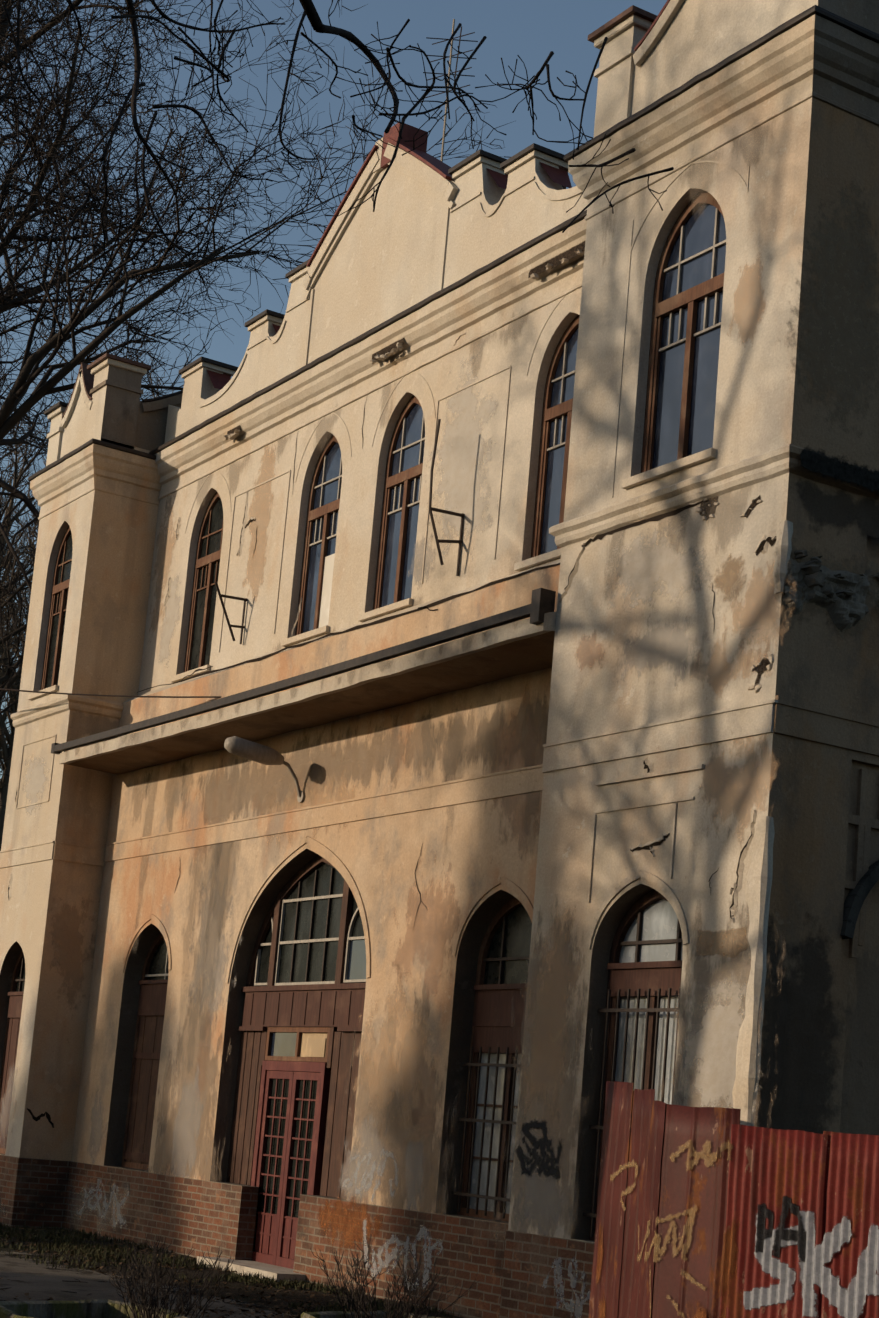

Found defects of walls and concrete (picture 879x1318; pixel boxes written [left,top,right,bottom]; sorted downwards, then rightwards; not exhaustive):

flaking render [695,496,720,521]
flaking render [740,495,763,518]
flaking render [775,547,879,637]
flaking render [748,654,774,693]
crack [630,833,670,857]
crack [708,810,757,923]